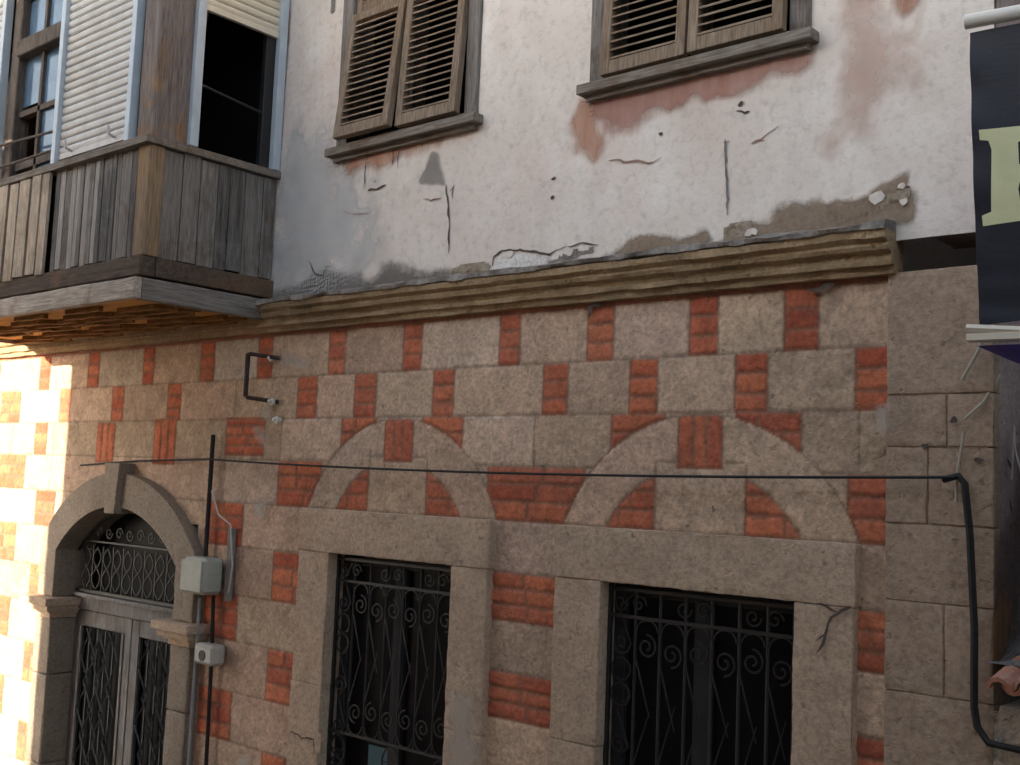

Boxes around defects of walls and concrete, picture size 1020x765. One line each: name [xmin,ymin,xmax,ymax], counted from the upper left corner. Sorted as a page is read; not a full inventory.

crack [342,150,399,215]
crack [609,157,660,165]
crack [723,126,778,215]
crack [425,184,455,253]